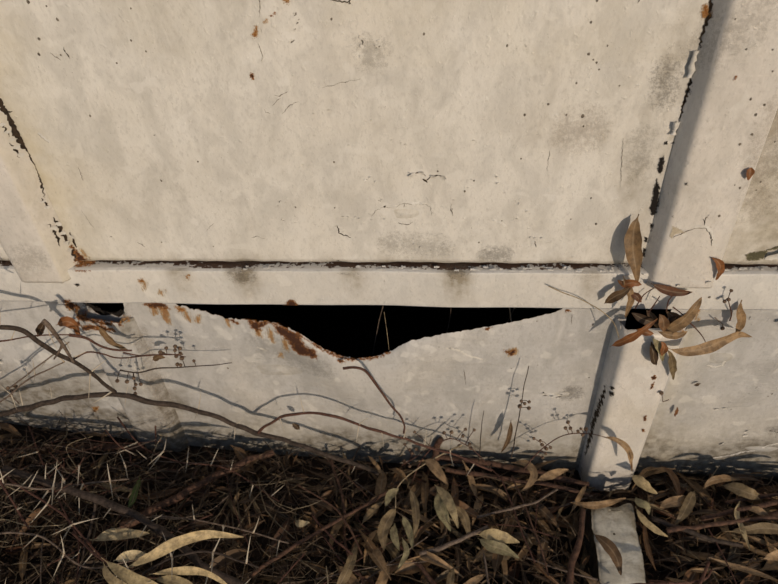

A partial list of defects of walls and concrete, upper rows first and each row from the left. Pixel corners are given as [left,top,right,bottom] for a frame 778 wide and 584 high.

crack [699,0,713,48]
crack [679,78,692,119]
crack [0,98,45,197]
rust [69,245,96,272]
crack [674,217,716,258]
peeling [739,246,778,270]
rust [63,299,132,333]
rust [144,290,201,324]
rust [225,319,391,363]
crack [584,385,606,456]